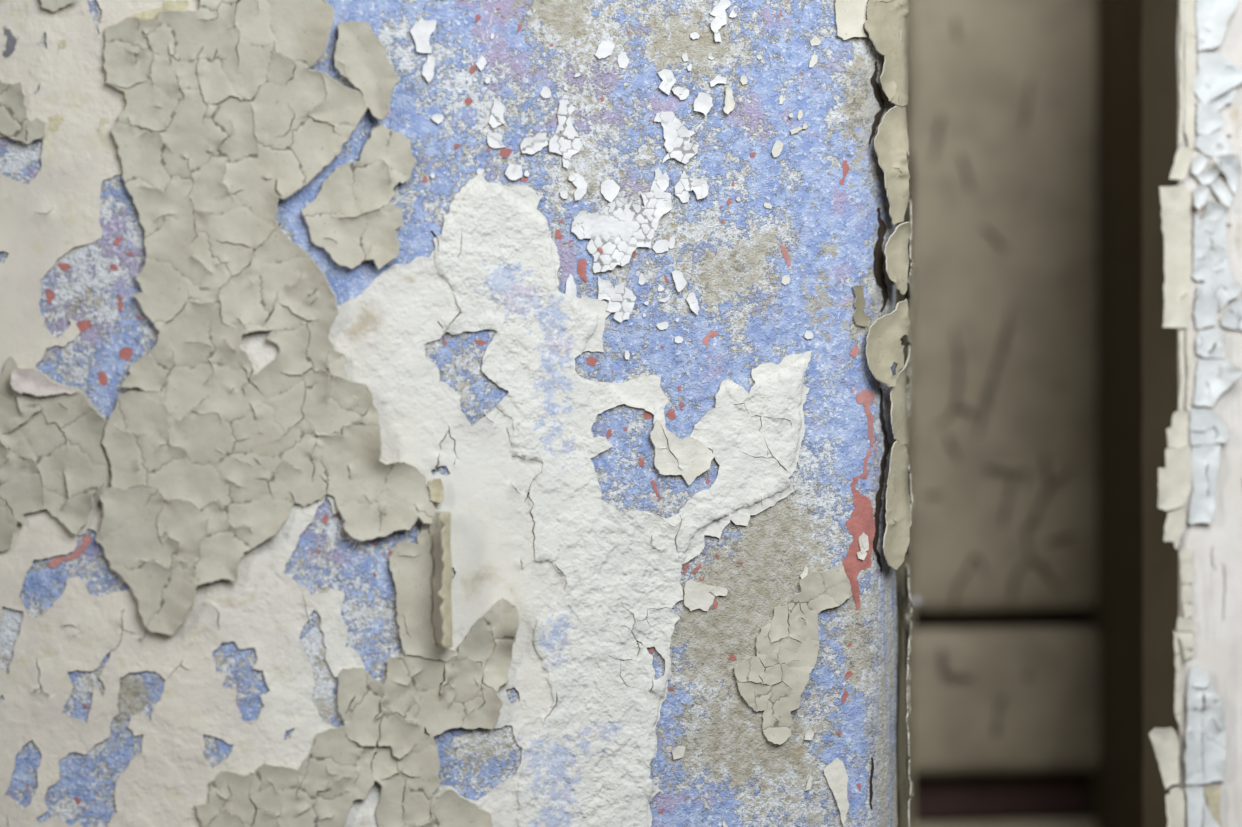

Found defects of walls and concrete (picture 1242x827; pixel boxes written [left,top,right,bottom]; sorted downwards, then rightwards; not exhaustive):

spalling [0,0,914,827]
peeling [1148,0,1242,827]